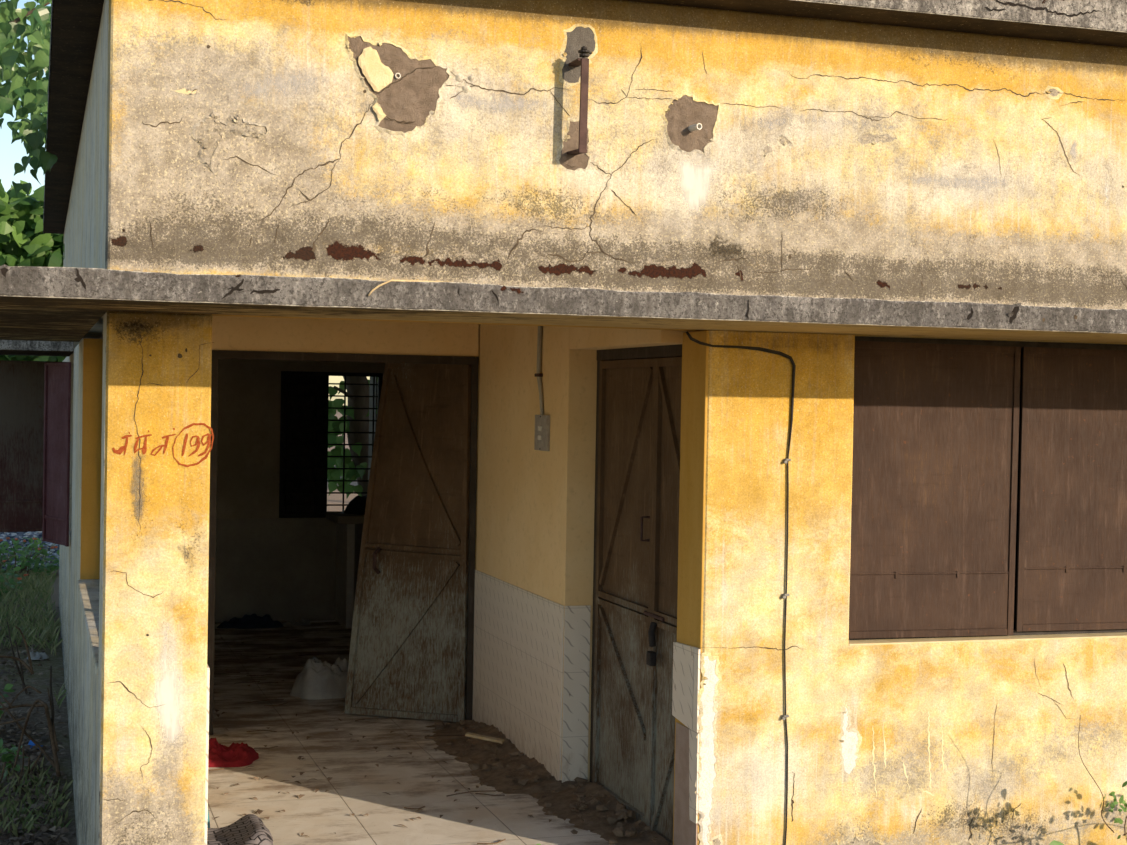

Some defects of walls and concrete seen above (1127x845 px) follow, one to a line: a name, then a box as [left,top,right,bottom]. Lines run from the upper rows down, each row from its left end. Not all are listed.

flaking render [345,33,453,138]
flaking render [661,92,721,157]
crack [791,74,1121,176]
crack [223,99,375,252]
crack [507,139,655,264]
corrosion [326,240,381,261]
corrosion [400,256,502,271]
corrosion [538,263,603,276]
corrosion [617,262,706,279]
leakage [131,458,144,518]
peeling [695,652,723,845]
peeling [838,702,862,777]